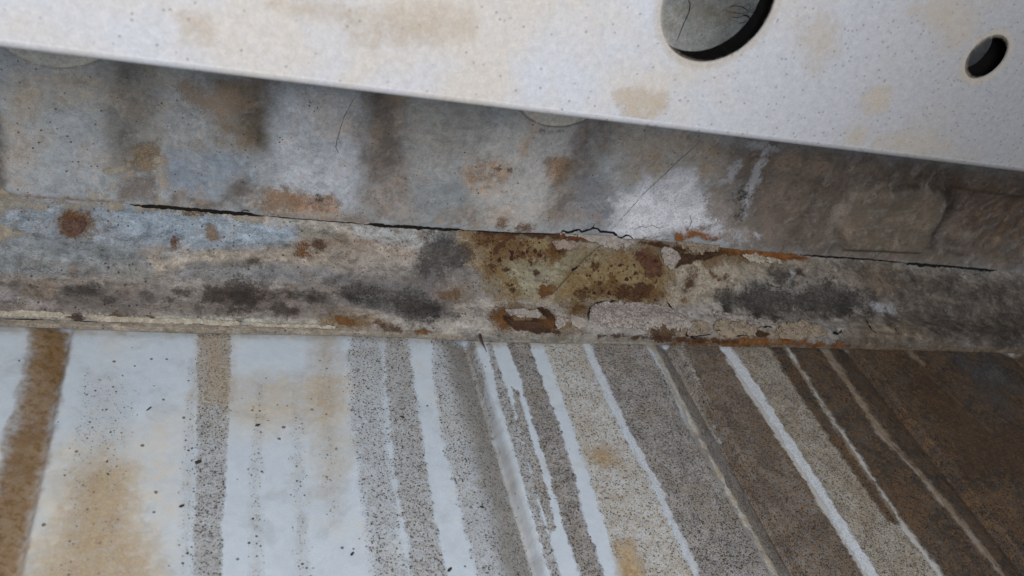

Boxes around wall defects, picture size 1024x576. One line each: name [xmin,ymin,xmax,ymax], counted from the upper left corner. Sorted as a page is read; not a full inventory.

rust [261,186,339,212]
water stain [604,146,770,249]
rust [58,210,94,239]
crack [130,144,697,298]
rust [294,239,327,258]
rust [459,218,808,336]
crack [800,254,998,272]
water stain [167,273,325,321]
water stain [341,283,460,322]
peeling [555,299,694,332]
rust [598,324,851,349]